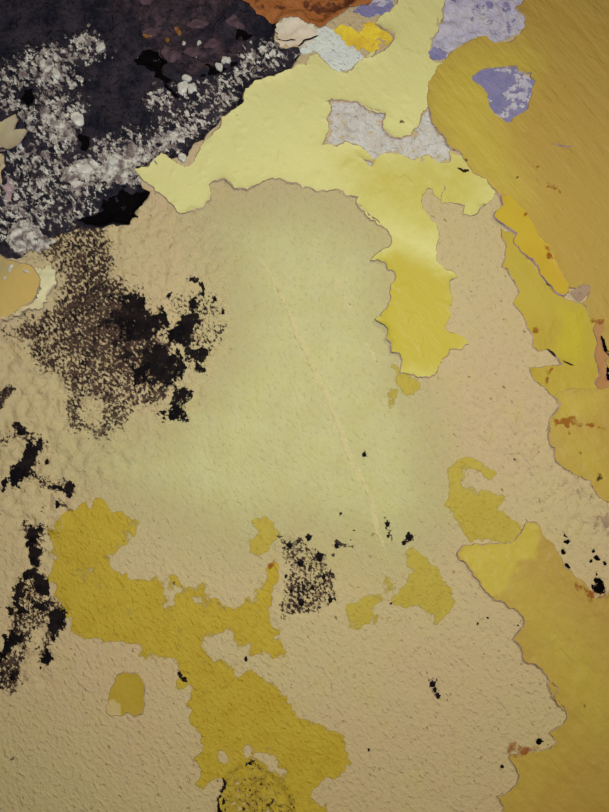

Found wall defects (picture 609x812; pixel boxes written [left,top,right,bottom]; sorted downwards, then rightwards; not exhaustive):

flaking render [430,0,525,60]
flaking render [488,67,535,119]
flaking render [0,0,394,259]
flaking render [327,101,450,166]
peeling [501,228,609,405]
water stain [0,211,455,812]
peeling [106,671,146,717]